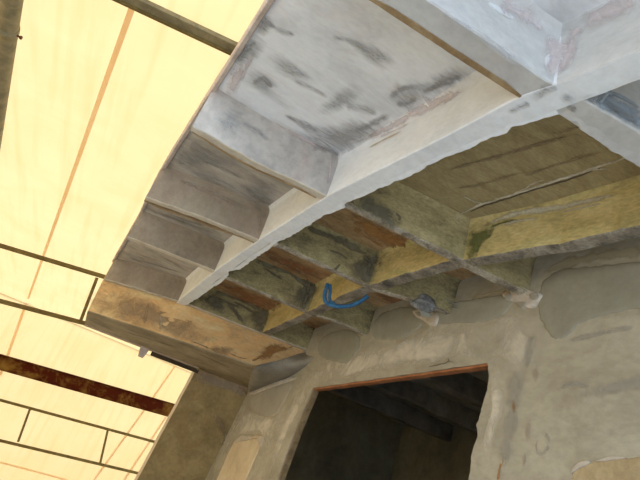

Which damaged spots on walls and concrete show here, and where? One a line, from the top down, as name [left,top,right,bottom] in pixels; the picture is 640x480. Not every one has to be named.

water stain [318,116,385,155]
crack [457,158,624,219]
water stain [467,195,611,258]
water stain [308,227,381,282]
water stain [259,260,316,309]
water stain [119,299,189,336]
water stain [205,291,268,330]